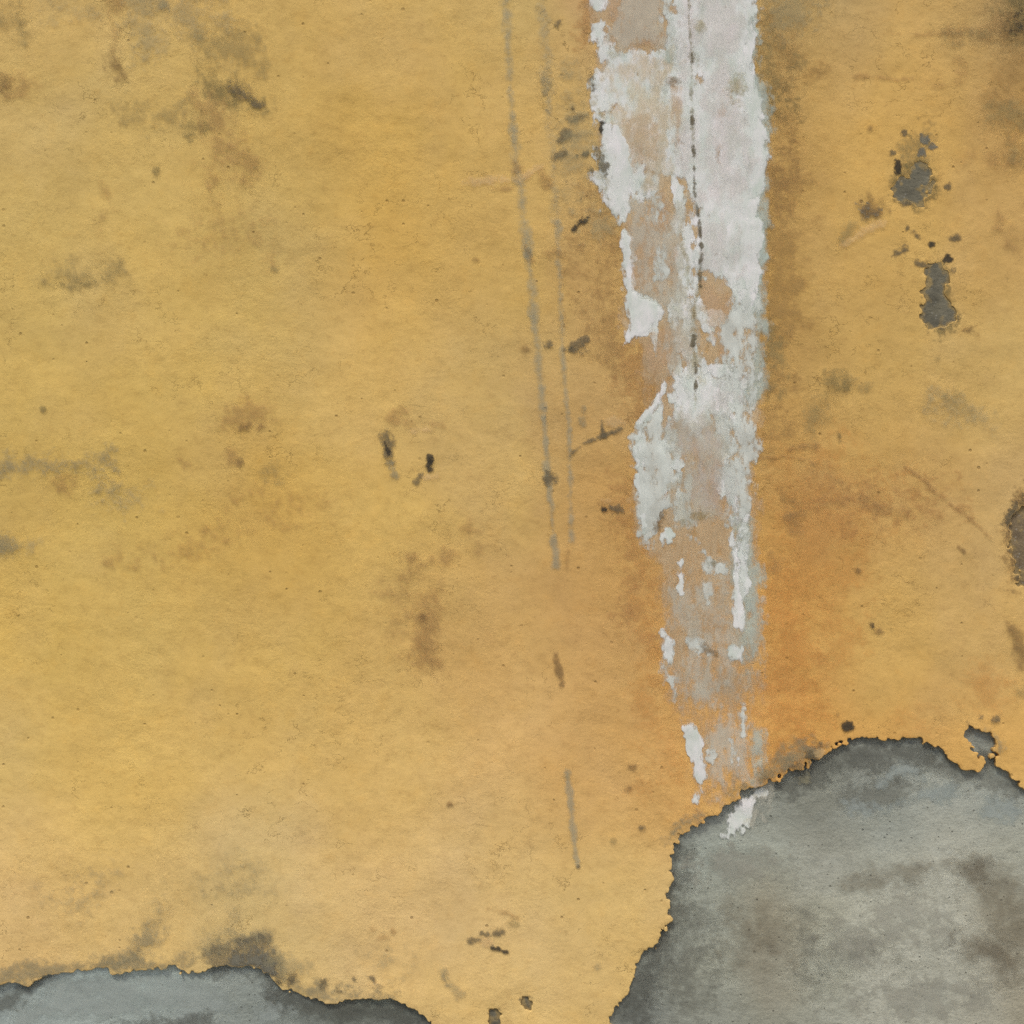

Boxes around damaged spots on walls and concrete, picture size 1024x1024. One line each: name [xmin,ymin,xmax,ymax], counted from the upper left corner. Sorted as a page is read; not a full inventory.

flaking render [0,964,431,1024]
flaking render [551,0,1024,1024]